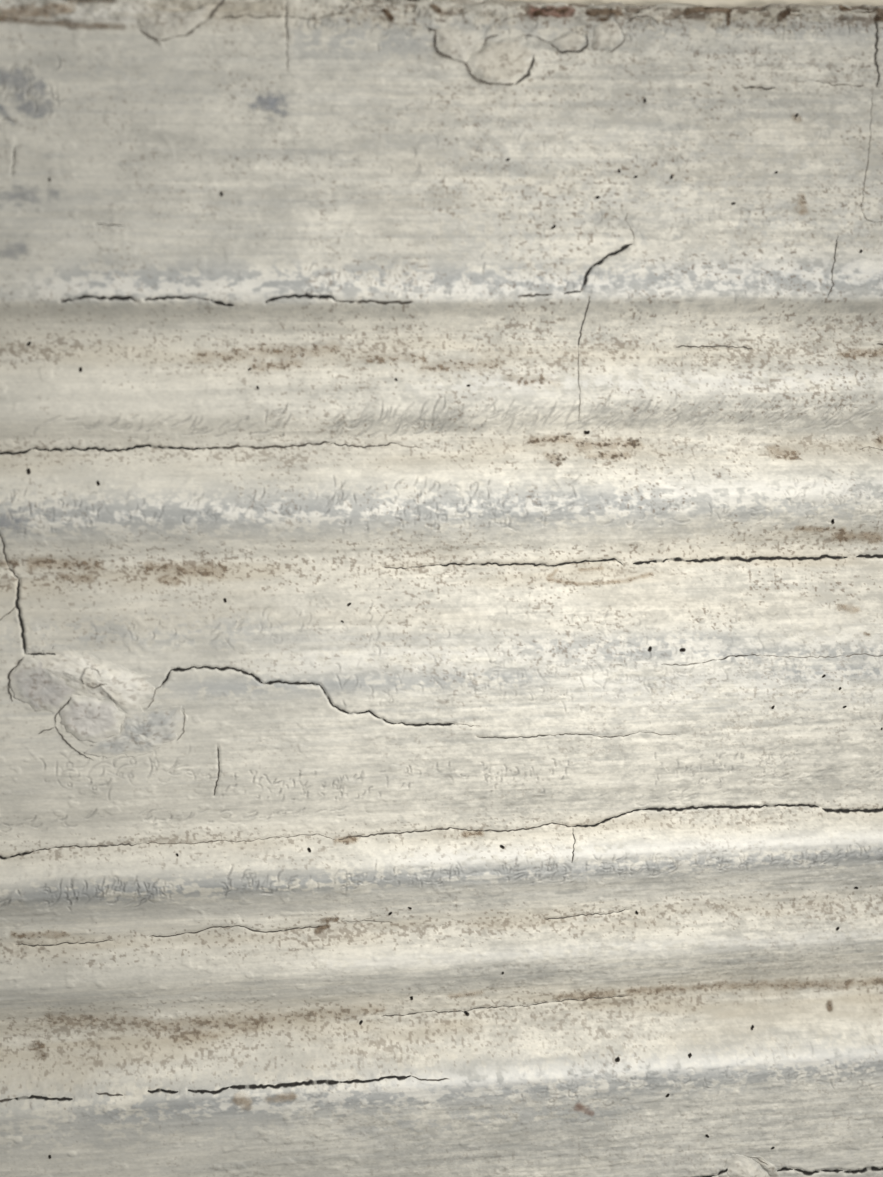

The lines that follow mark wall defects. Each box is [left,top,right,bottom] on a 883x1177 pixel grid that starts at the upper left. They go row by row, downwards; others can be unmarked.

peeling [427,6,659,86]
crack [744,21,882,222]
crack [61,295,234,306]
crack [266,294,413,305]
crack [519,216,635,414]
crack [0,441,420,455]
crack [384,554,883,569]
crack [0,534,56,655]
crack [162,666,676,739]
crack [0,804,883,862]
crack [0,1075,448,1102]
crack [777,1167,883,1175]